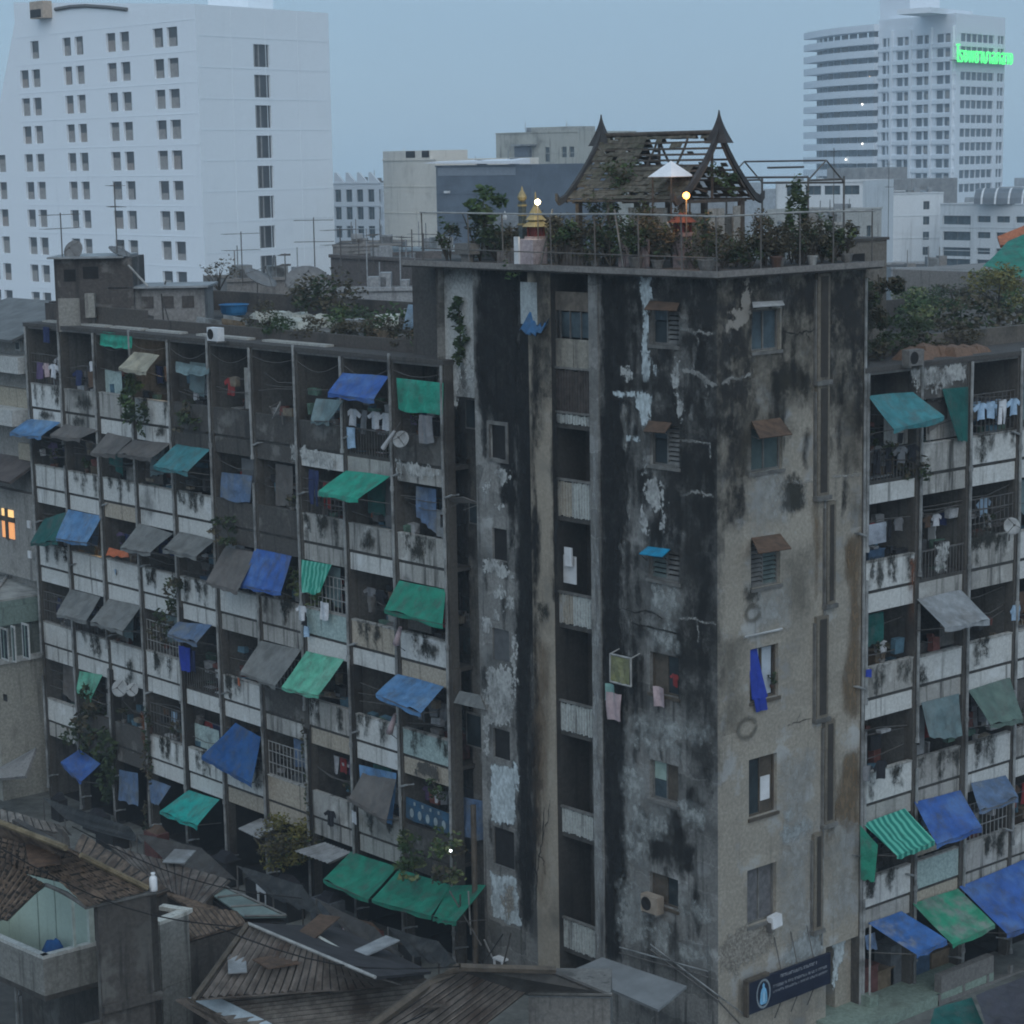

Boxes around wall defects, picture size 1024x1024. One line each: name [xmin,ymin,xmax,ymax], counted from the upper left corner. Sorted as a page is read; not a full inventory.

peeling [613,277,657,442]
water stain [830,270,866,422]
peeling [911,363,966,394]
water stain [303,514,338,547]
water stain [363,532,375,549]
water stain [454,270,559,933]
water stain [593,267,815,968]
peeling [481,635,520,825]
peeling [490,870,522,928]